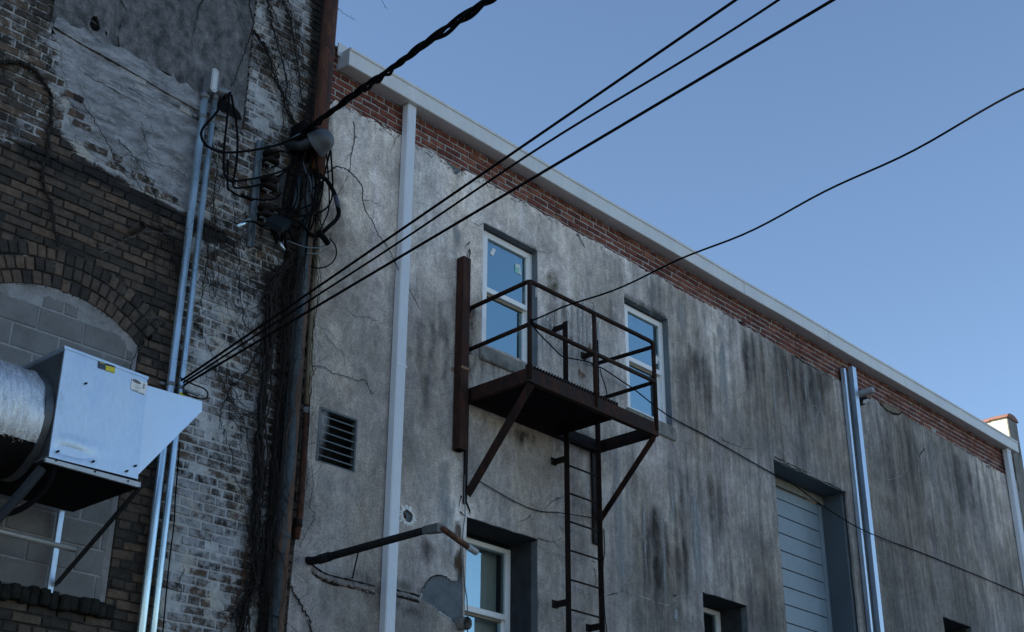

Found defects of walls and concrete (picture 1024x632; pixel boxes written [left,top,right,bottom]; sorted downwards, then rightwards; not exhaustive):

spalling [217,98,242,120]
peeling [64,89,180,205]
crack [331,120,399,206]
spalling [858,390,903,415]
spalling [419,573,462,631]